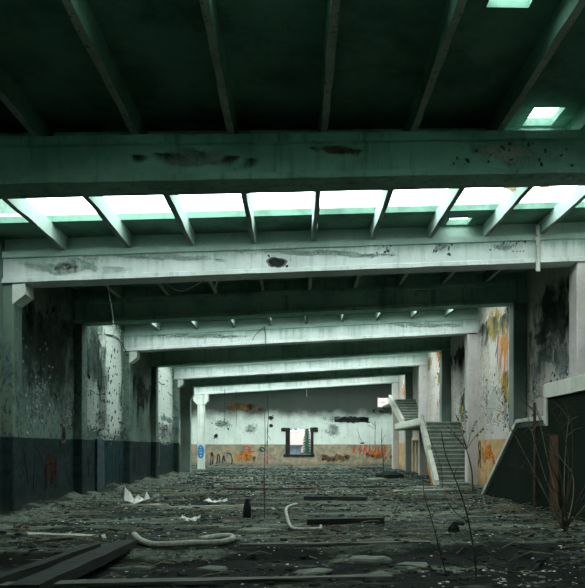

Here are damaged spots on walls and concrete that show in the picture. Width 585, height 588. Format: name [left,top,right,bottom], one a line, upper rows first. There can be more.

corrosion [322,146,361,154]
spalling [266,254,291,268]
damp [22,302,75,398]
damp [87,328,105,388]
damp [529,276,569,370]